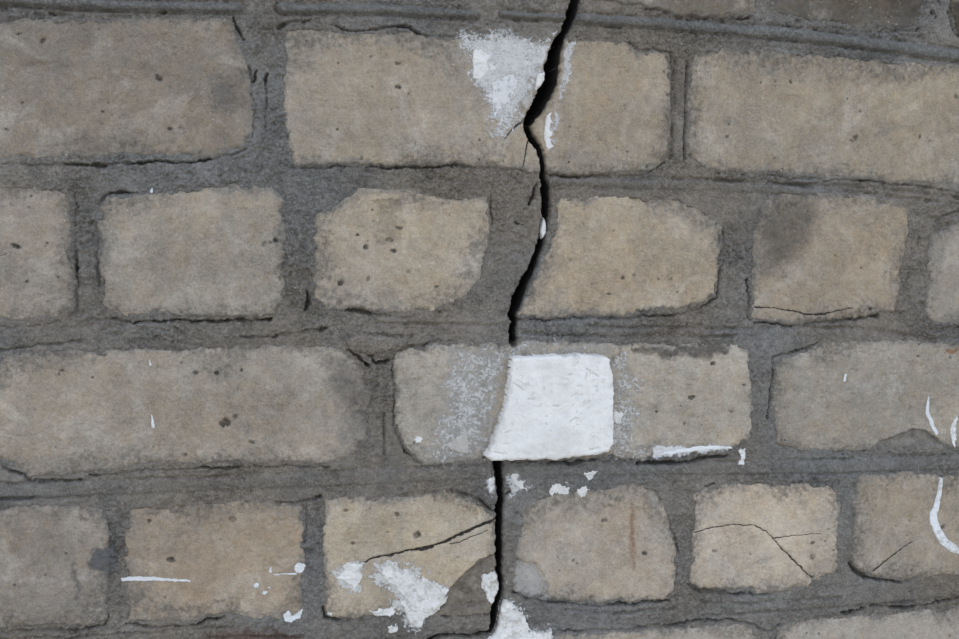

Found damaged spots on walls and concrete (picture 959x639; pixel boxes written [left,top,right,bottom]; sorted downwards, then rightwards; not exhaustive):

peeling [472,49,545,120]
crack [504,0,578,342]
crack [359,461,511,639]
peeling [330,554,560,639]